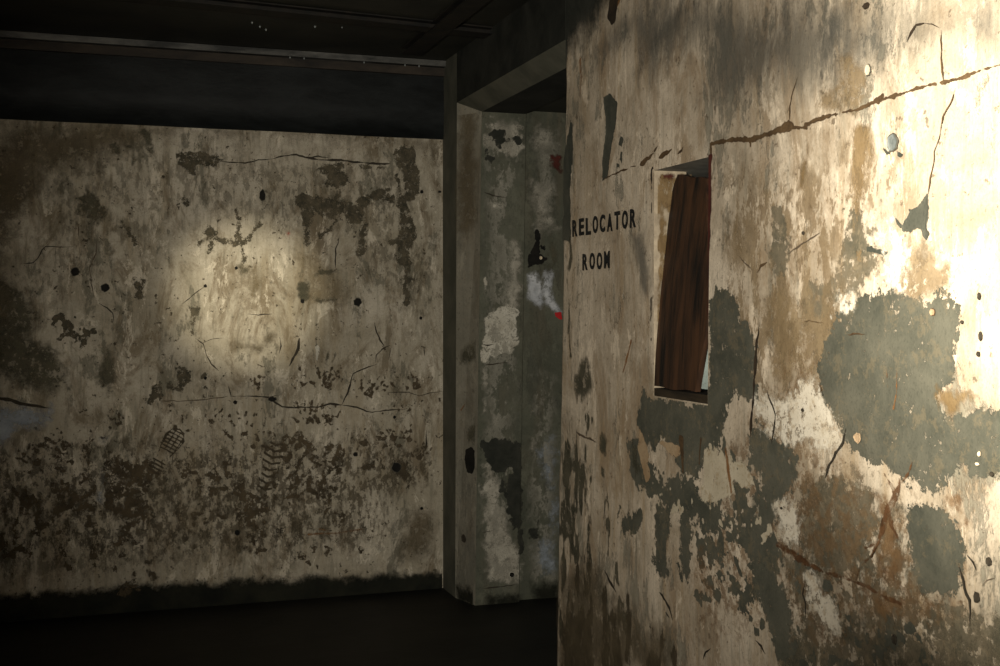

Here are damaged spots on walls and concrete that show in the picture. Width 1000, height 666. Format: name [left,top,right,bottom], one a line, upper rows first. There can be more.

crack [710,23,1000,191]
crack [222,154,390,165]
crack [604,147,683,179]
peeling [895,194,929,240]
water stain [297,282,333,303]
crack [163,323,442,413]
peeling [604,284,855,666]
crack [825,428,846,477]
peeling [817,283,1000,599]
peeling [558,414,604,639]
peeling [810,579,938,666]